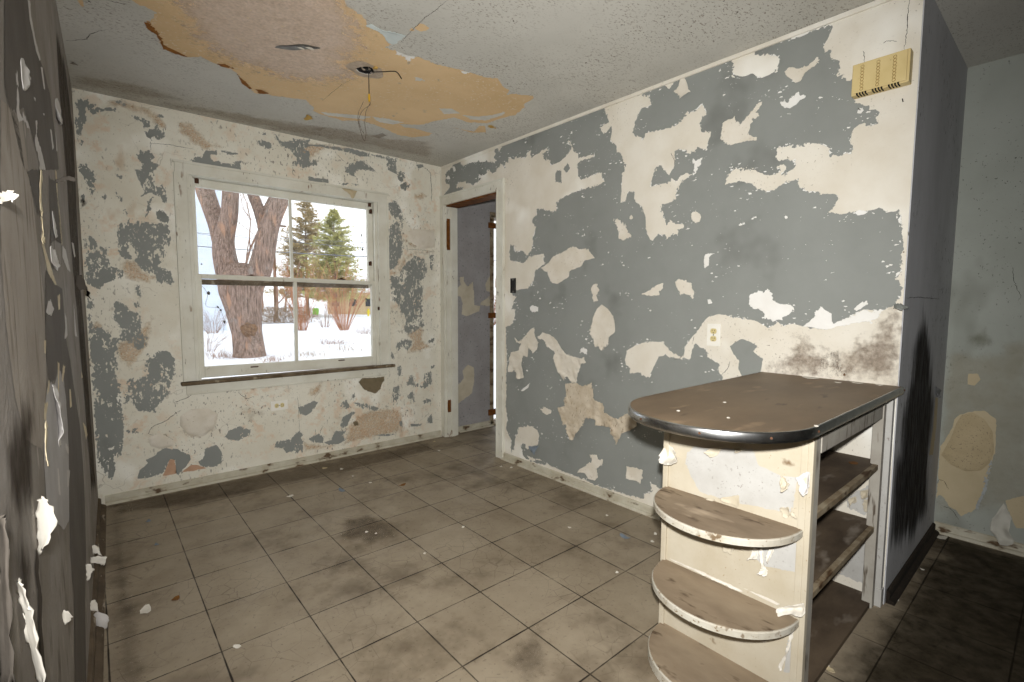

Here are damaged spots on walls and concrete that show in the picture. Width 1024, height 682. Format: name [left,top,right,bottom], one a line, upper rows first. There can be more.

peeling [132,0,534,199]
peeling [0,0,176,682]
peeling [275,201,435,453]
peeling [444,25,909,519]
peeling [138,426,251,479]
leakage [891,327,933,543]
peeling [929,386,997,516]
peeling [670,558,779,605]
peeling [747,543,796,577]
peeling [990,496,1024,546]
peeling [778,632,794,673]